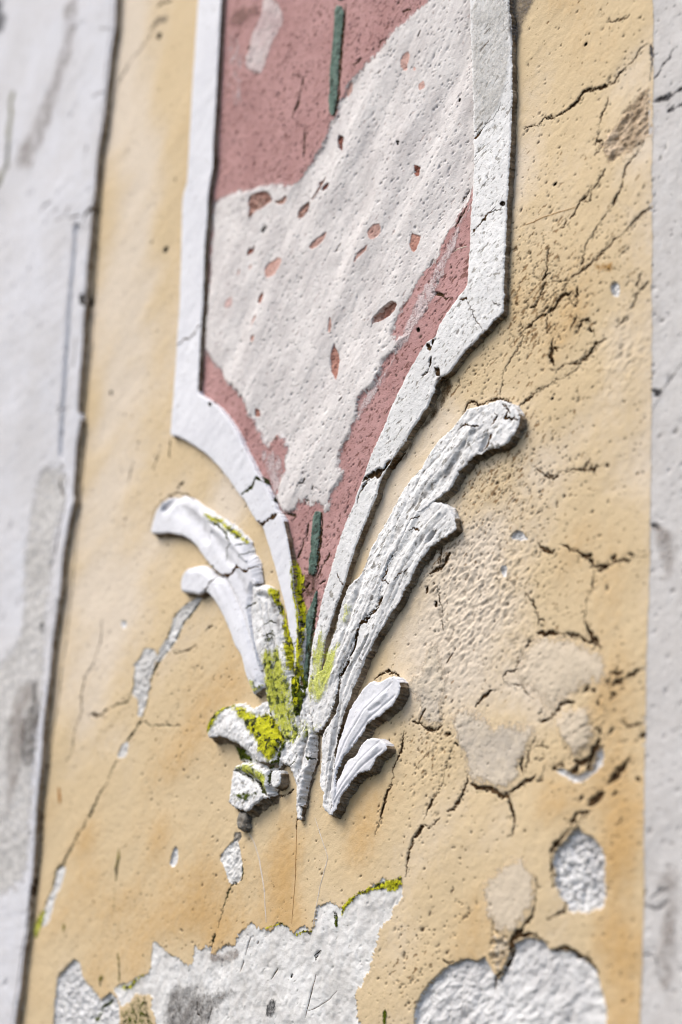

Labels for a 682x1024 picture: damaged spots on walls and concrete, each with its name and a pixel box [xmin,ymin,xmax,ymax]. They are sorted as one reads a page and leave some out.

spalling [248,191,287,217]
spalling [297,178,329,218]
crack [455,42,682,452]
spalling [372,301,397,324]
spalling [330,344,340,380]
crack [535,459,609,480]
crack [43,466,350,914]
crack [375,543,646,989]
peeling [220,832,243,884]
spalling [553,825,607,914]
peeling [54,878,403,1024]
spalling [414,937,607,1024]